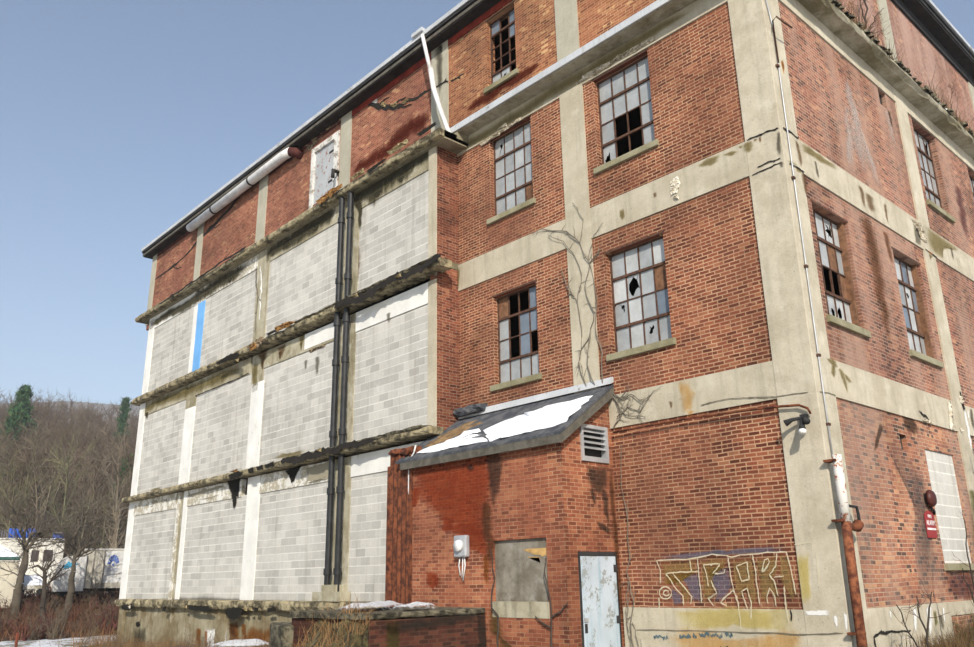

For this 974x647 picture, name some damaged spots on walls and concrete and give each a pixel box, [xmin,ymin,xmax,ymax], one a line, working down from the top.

crack [367,73,464,111]
spalling [315,122,436,205]
leakage [356,118,425,169]
leakage [354,151,429,225]
crack [155,195,262,331]
spalling [334,254,441,309]
spalling [216,321,295,364]
spalling [190,438,375,500]